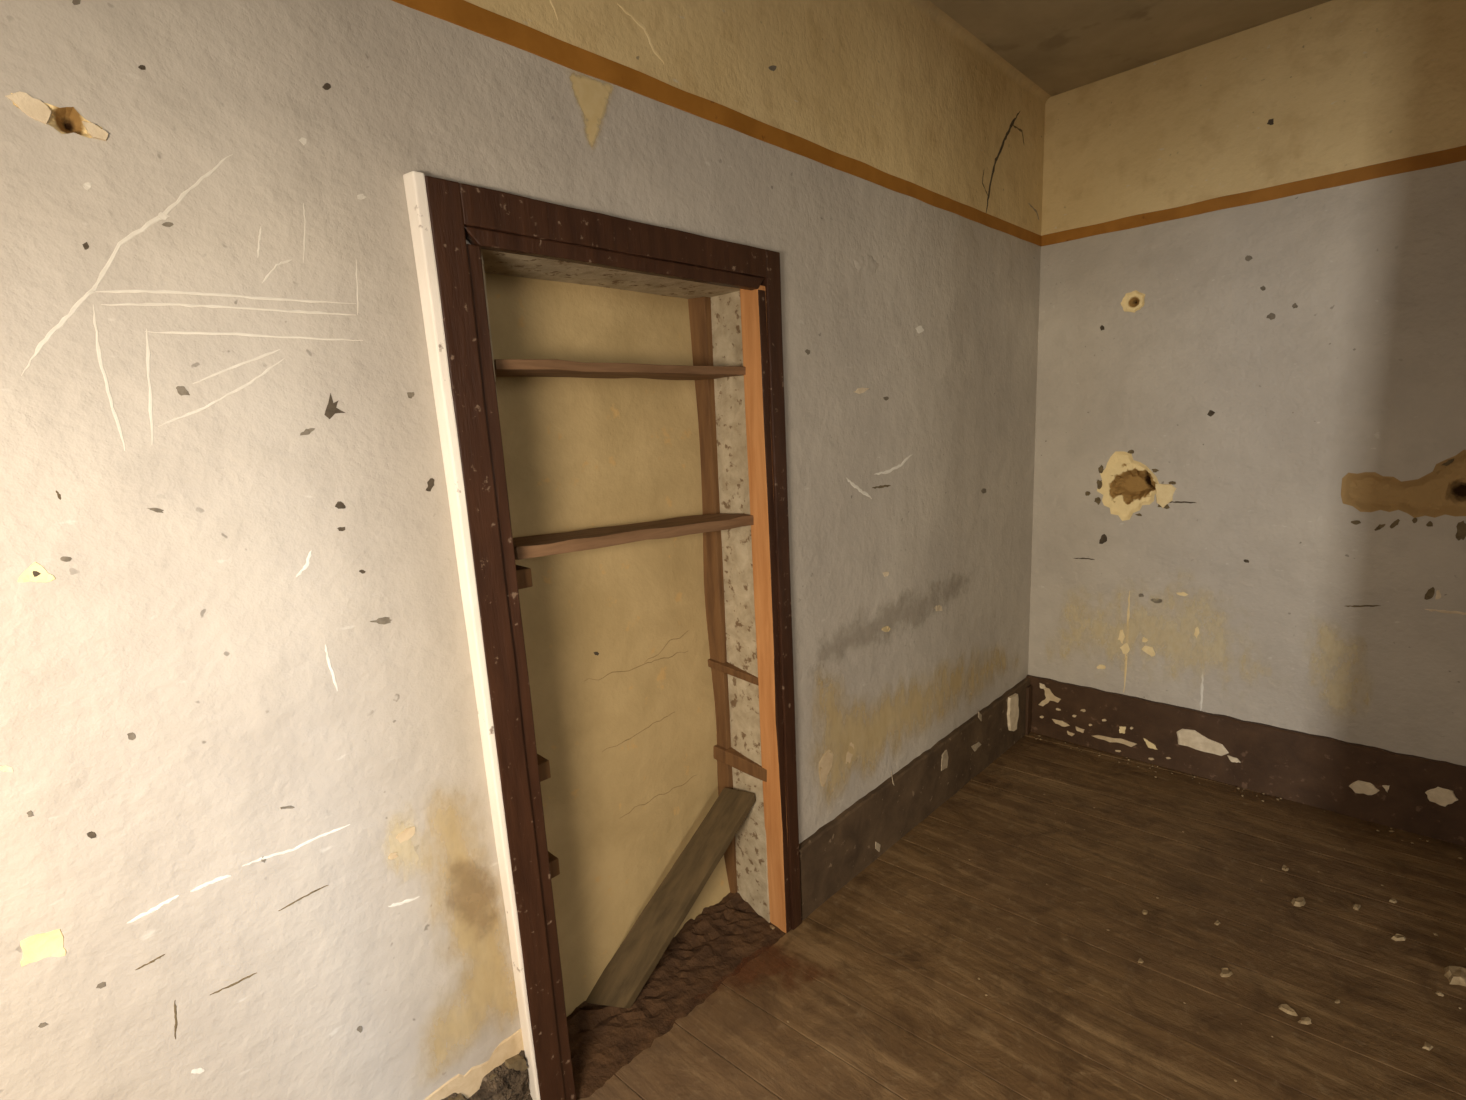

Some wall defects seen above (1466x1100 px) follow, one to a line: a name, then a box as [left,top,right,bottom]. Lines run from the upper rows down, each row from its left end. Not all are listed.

spalling [6,91,108,141]
spalling [1120,290,1146,313]
spalling [1085,450,1196,521]
spalling [1341,450,1466,541]
damp [1073,591,1223,711]
peeling [1038,683,1241,763]
peeling [1349,780,1389,795]
peeling [1425,787,1458,807]
damp [435,807,516,1060]
spalling [424,1028,533,1100]